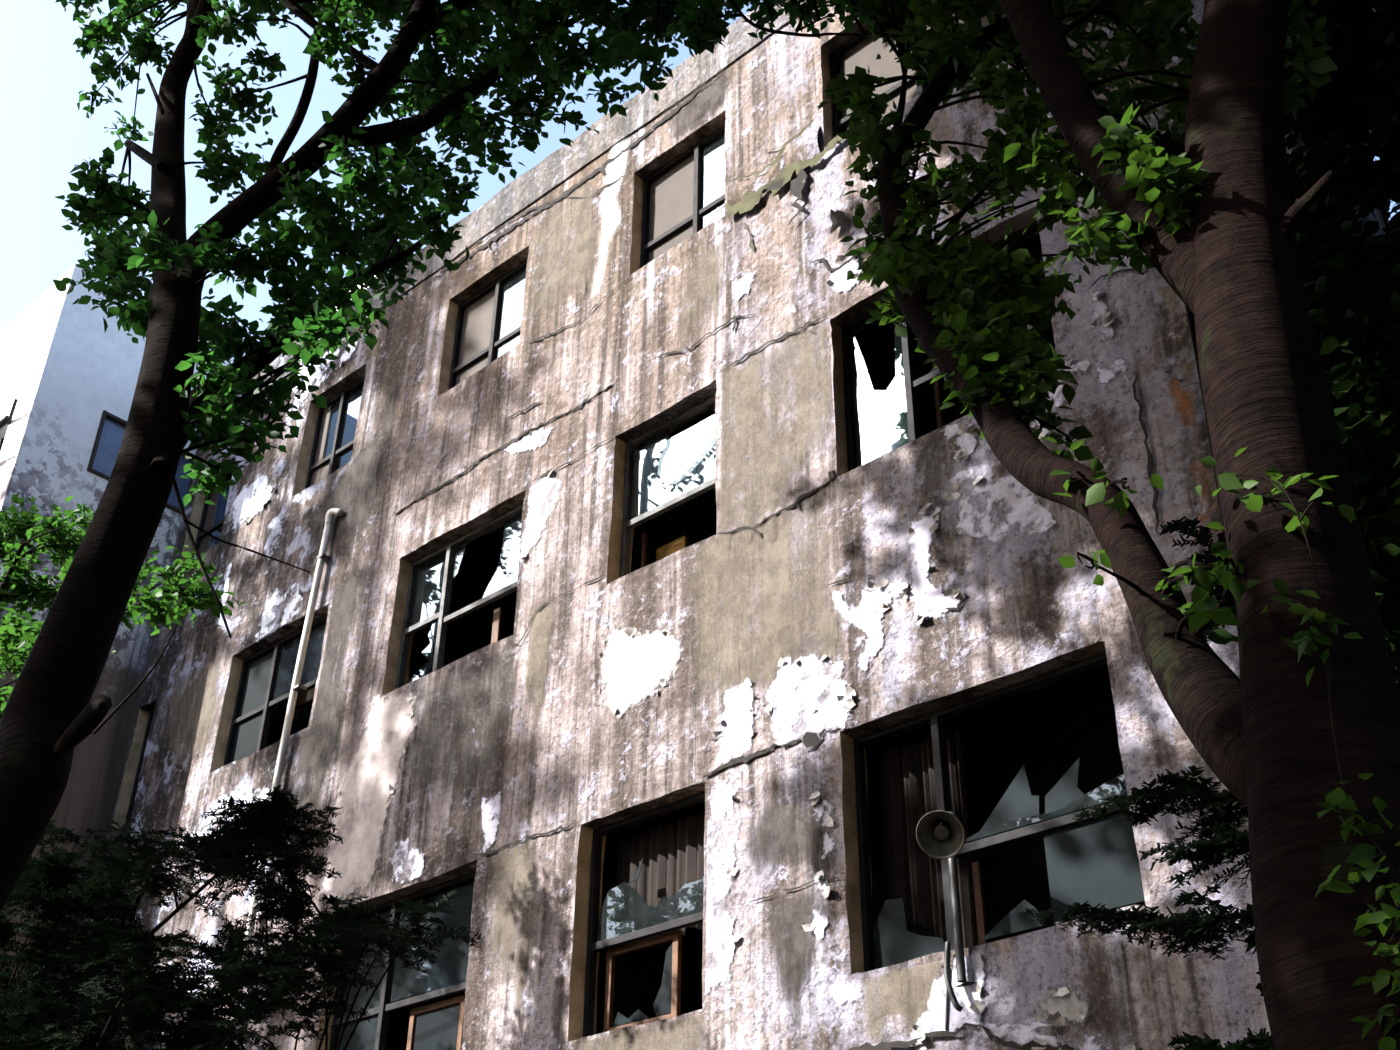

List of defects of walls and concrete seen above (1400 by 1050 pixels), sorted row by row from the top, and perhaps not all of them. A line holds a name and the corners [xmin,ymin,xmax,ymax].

crack [1132,370,1199,534]
peeling [711,423,1056,763]
flaking render [599,625,683,718]
peeling [481,791,501,853]
peeling [705,780,742,990]
water stain [749,801,823,872]
peeling [802,792,836,939]
water stain [771,892,820,1013]
crack [848,1023,1074,1050]
crack [956,980,978,988]
peeling [909,950,1101,1050]